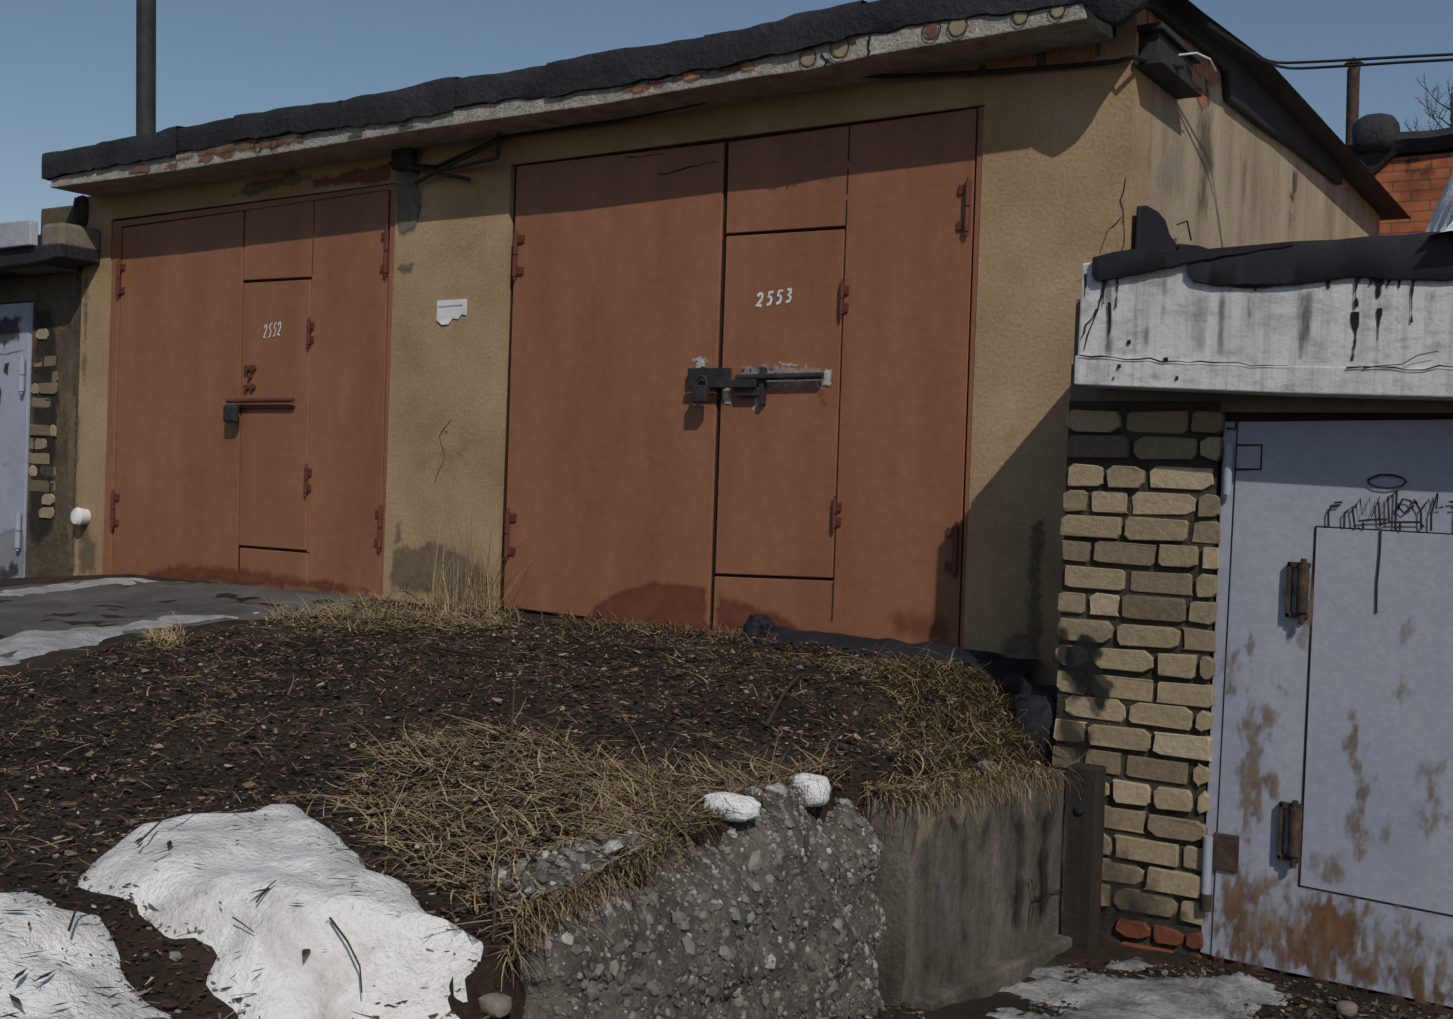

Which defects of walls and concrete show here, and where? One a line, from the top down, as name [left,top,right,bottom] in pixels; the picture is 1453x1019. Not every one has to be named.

flaking render [1147,11,1222,109]
damp [1200,123,1212,202]
damp [1084,274,1119,351]
damp [1299,280,1331,350]
damp [1350,277,1415,361]
flaking render [0,310,76,578]
damp [390,532,488,604]
corrosion [585,583,799,631]
corrosion [1238,706,1279,841]
corrosion [1205,813,1453,1006]